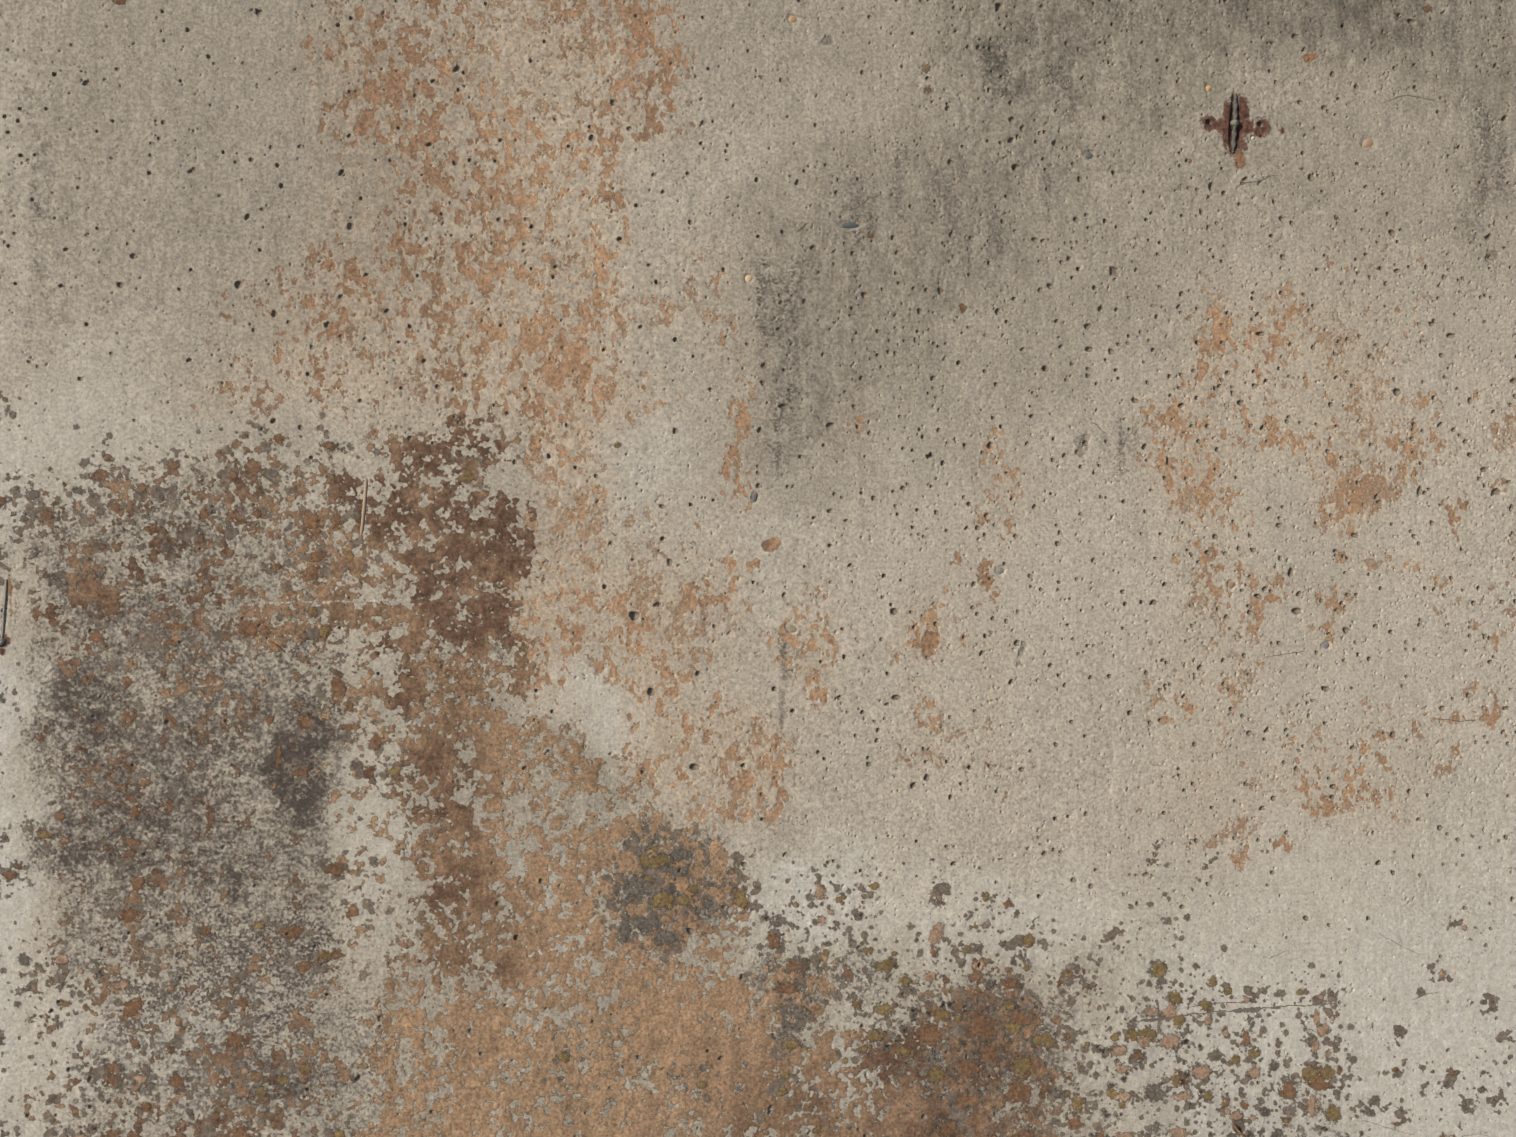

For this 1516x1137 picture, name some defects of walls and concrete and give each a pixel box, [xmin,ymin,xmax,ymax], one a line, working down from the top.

corrosion [1200,92,1284,168]
peeling [206,0,839,835]
peeling [946,425,1024,606]
spalling [885,583,1010,665]
leakage [11,413,1109,1137]
peeling [896,678,1003,790]